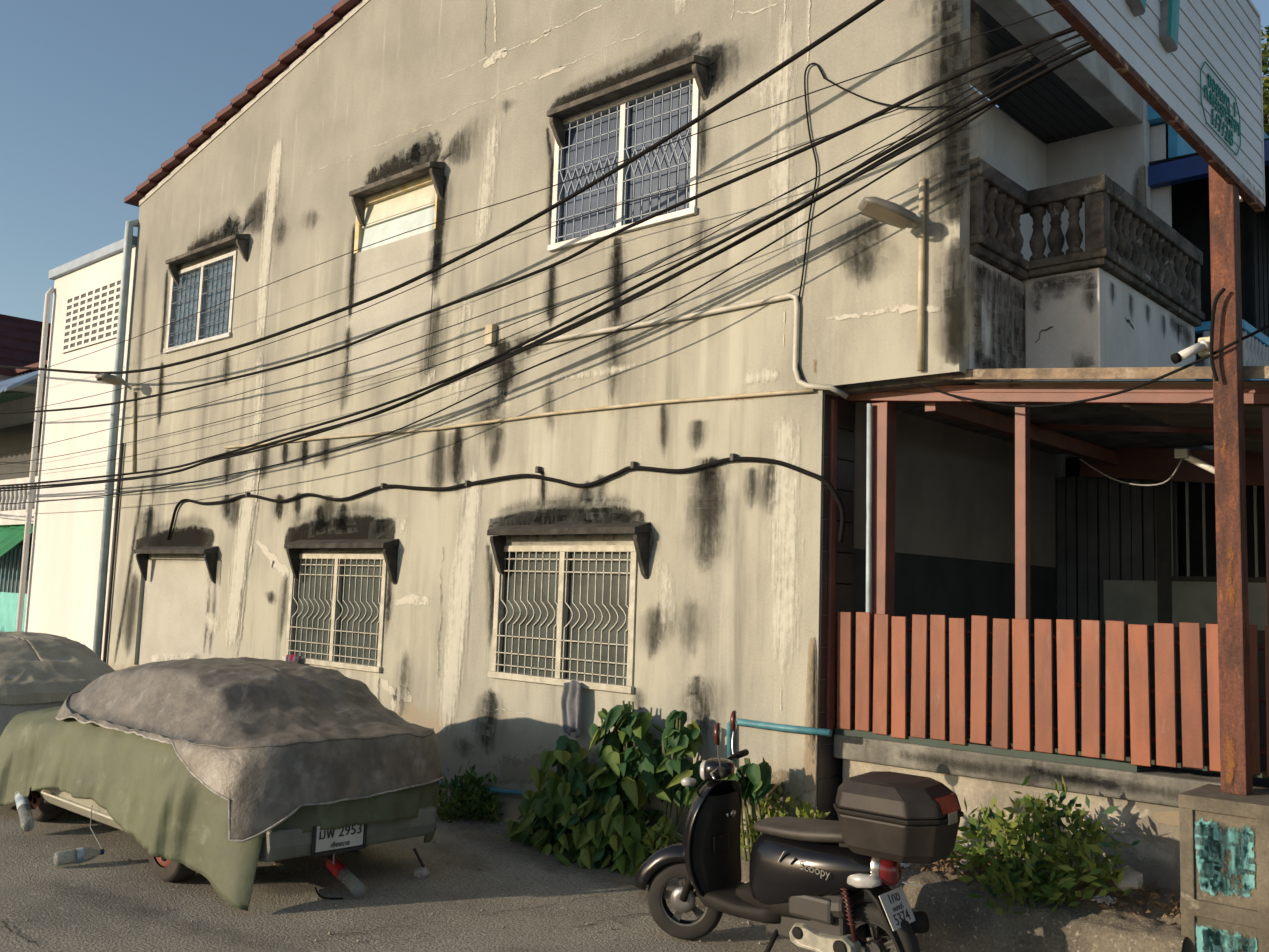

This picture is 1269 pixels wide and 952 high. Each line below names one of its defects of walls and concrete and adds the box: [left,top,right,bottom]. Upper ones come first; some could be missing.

crack [307,0,644,175]
damp [550,33,725,109]
crack [731,0,811,61]
damp [754,22,806,261]
damp [187,141,282,336]
damp [432,176,446,287]
damp [224,446,267,645]
damp [434,427,654,732]
damp [749,422,799,667]
peeling [1153,811,1180,826]
peeling [1194,819,1255,897]
peeling [1195,925,1258,952]